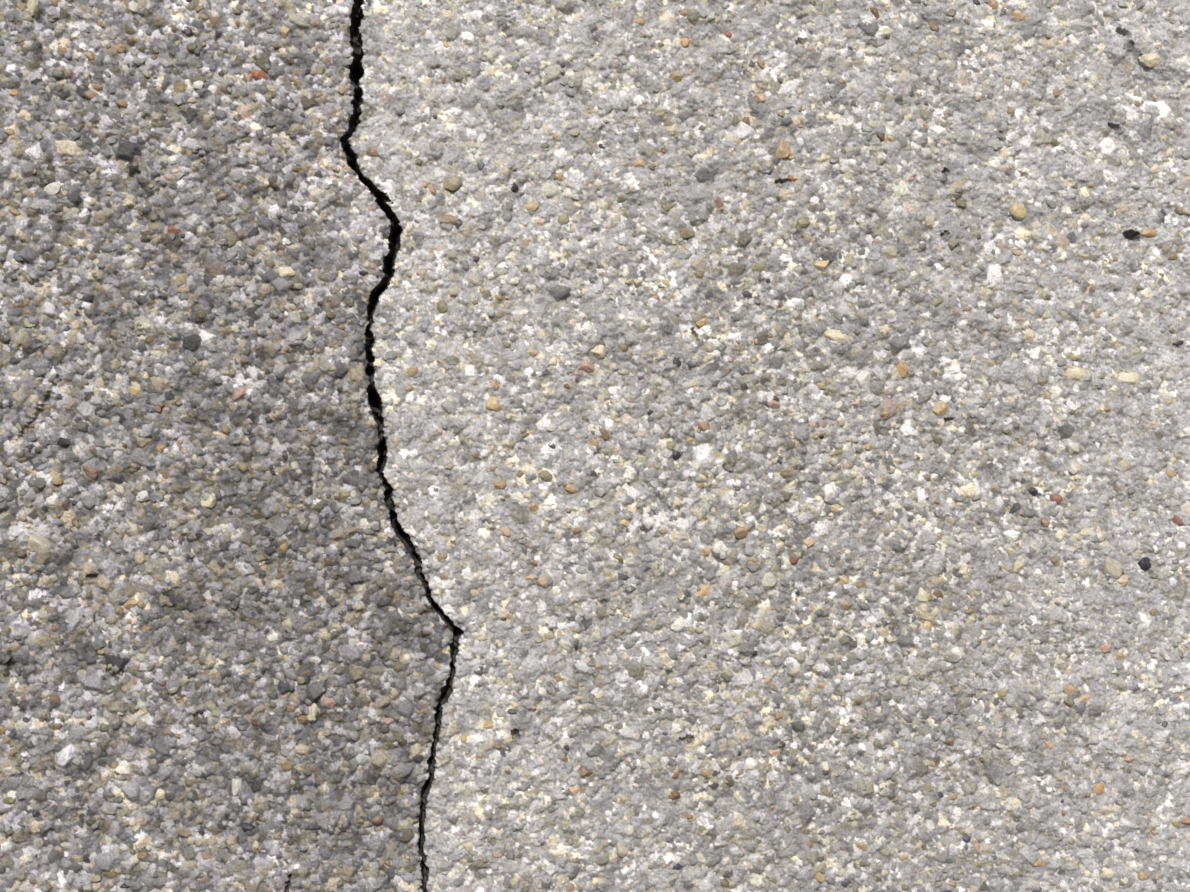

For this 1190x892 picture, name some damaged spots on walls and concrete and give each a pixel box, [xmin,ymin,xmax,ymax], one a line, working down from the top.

crack [340,0,464,892]